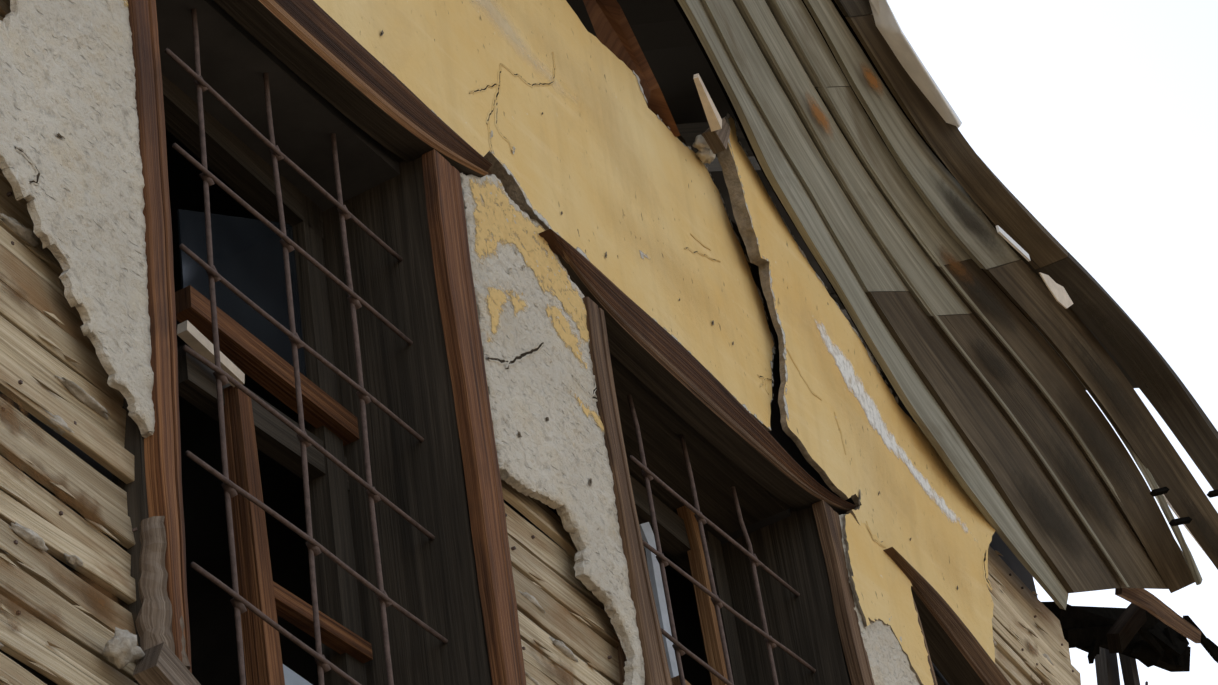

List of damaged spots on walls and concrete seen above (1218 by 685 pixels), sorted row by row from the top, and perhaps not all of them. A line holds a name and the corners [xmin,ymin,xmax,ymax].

crack [469,52,556,152]
flaking render [0,0,155,438]
crack [684,234,721,262]
flaking render [460,146,645,685]
crack [758,348,847,455]
flaking render [839,490,934,685]